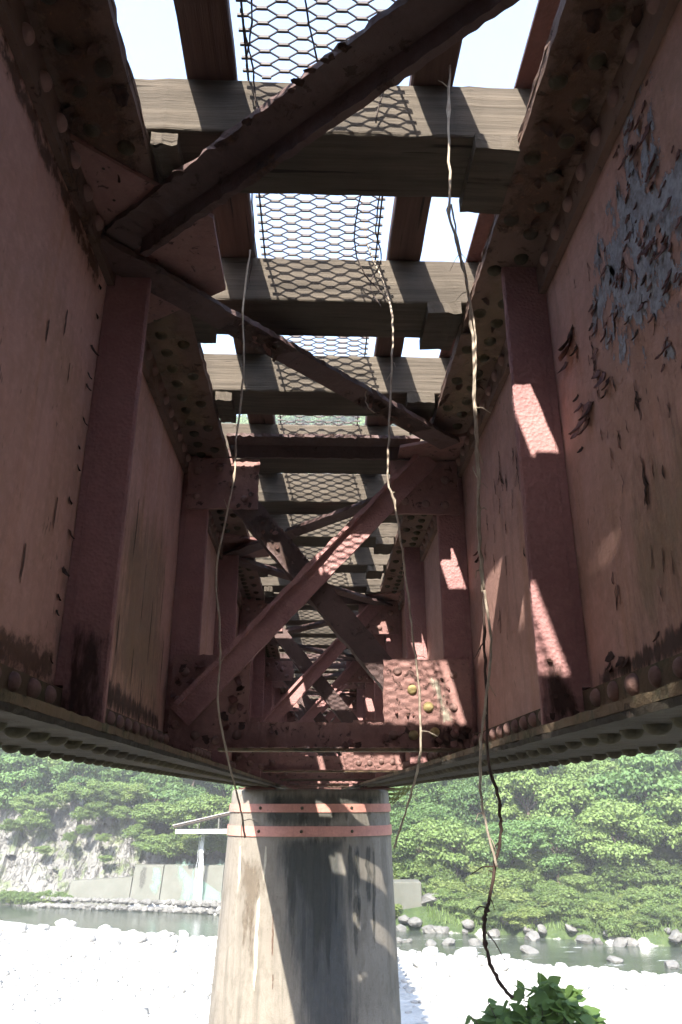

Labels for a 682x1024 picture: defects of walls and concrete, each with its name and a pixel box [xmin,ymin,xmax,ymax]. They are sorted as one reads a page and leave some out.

peeling [568,71,682,453]
peeling [557,325,577,374]
rust [0,627,53,684]
damp [238,846,267,990]
damp [283,840,376,1024]